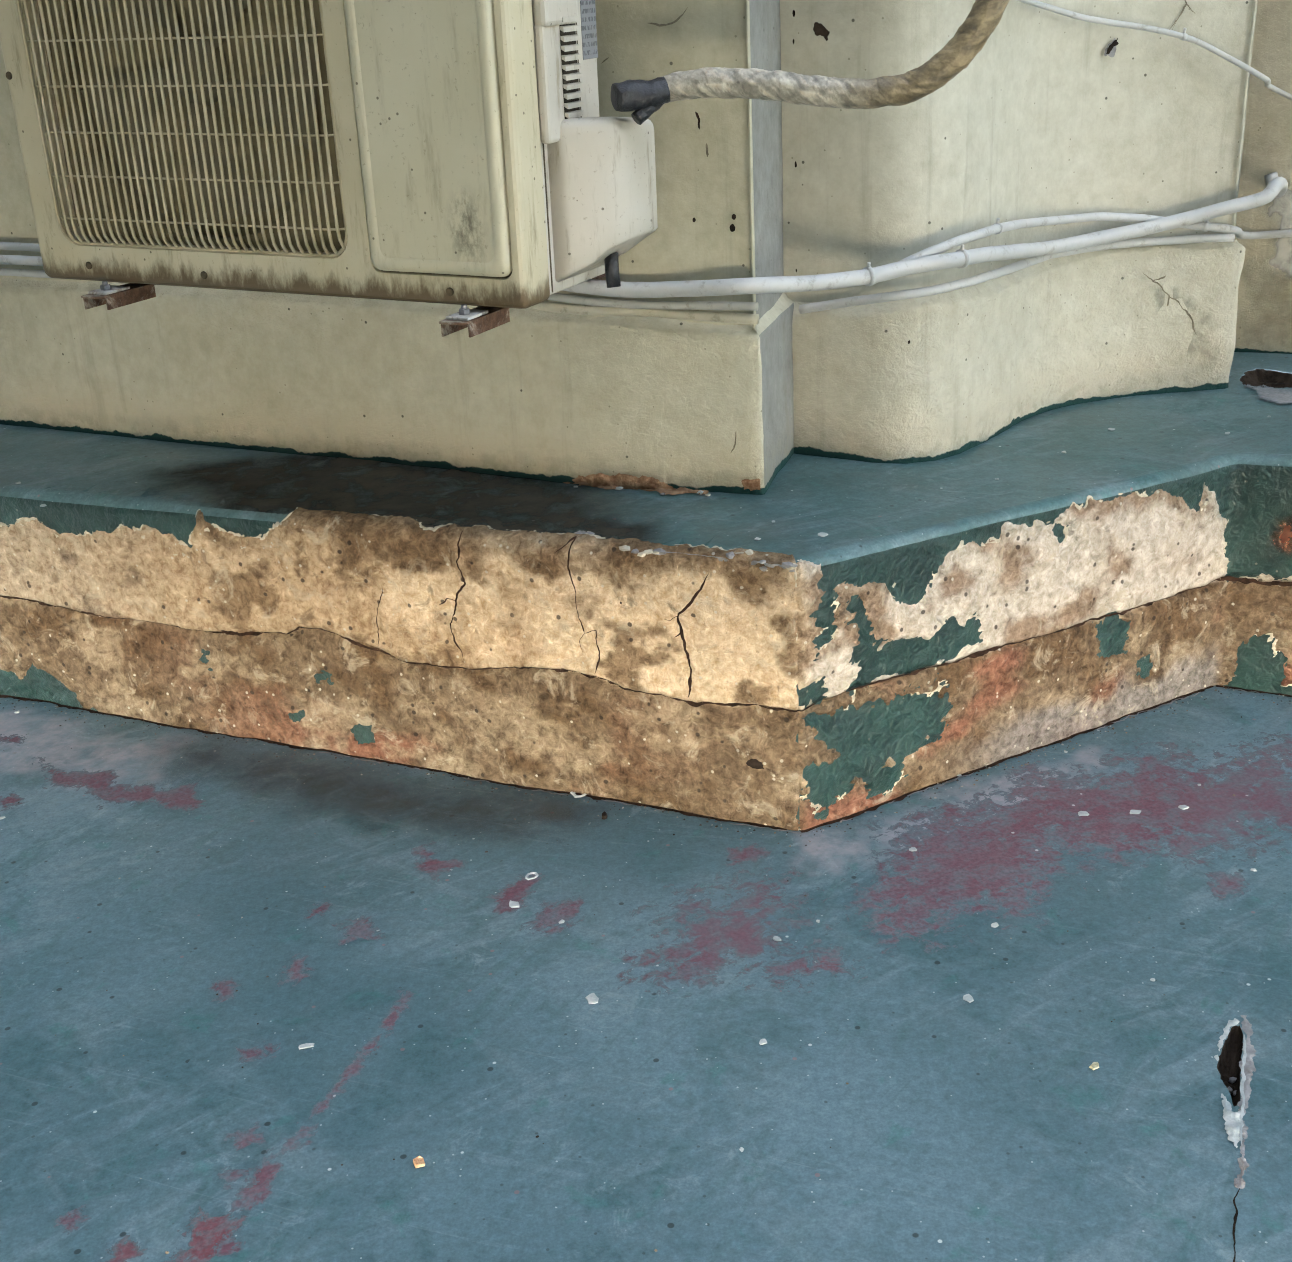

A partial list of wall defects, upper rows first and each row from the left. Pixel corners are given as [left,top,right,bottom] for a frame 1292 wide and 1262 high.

spalling [1237,369,1292,405]
water stain [168,455,652,541]
spalling [563,473,711,496]
spalling [741,479,760,491]
crack [0,529,1292,712]
peeling [0,482,1292,998]
crack [0,685,1292,834]
crack [1214,1015,1256,1262]